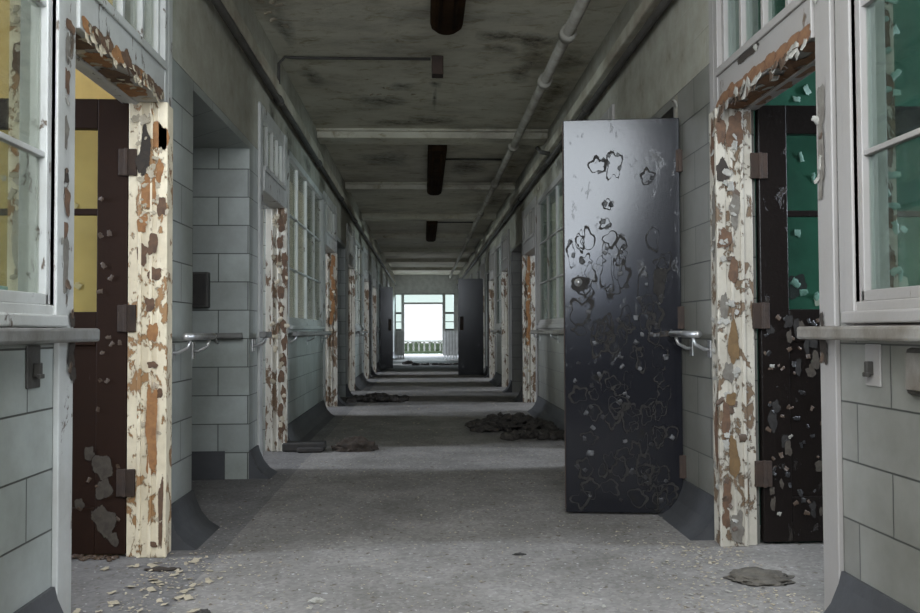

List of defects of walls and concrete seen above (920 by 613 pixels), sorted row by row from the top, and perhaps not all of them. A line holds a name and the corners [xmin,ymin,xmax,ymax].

peeling [65,16,165,150]
peeling [61,168,72,294]
peeling [131,113,170,312]
peeling [710,24,825,283]
peeling [68,342,76,383]
peeling [74,446,120,547]
peeling [147,323,158,342]
peeling [146,455,163,549]
peeling [269,214,290,434]
peeling [711,292,748,543]
peeling [765,399,823,518]
peeling [764,274,827,377]